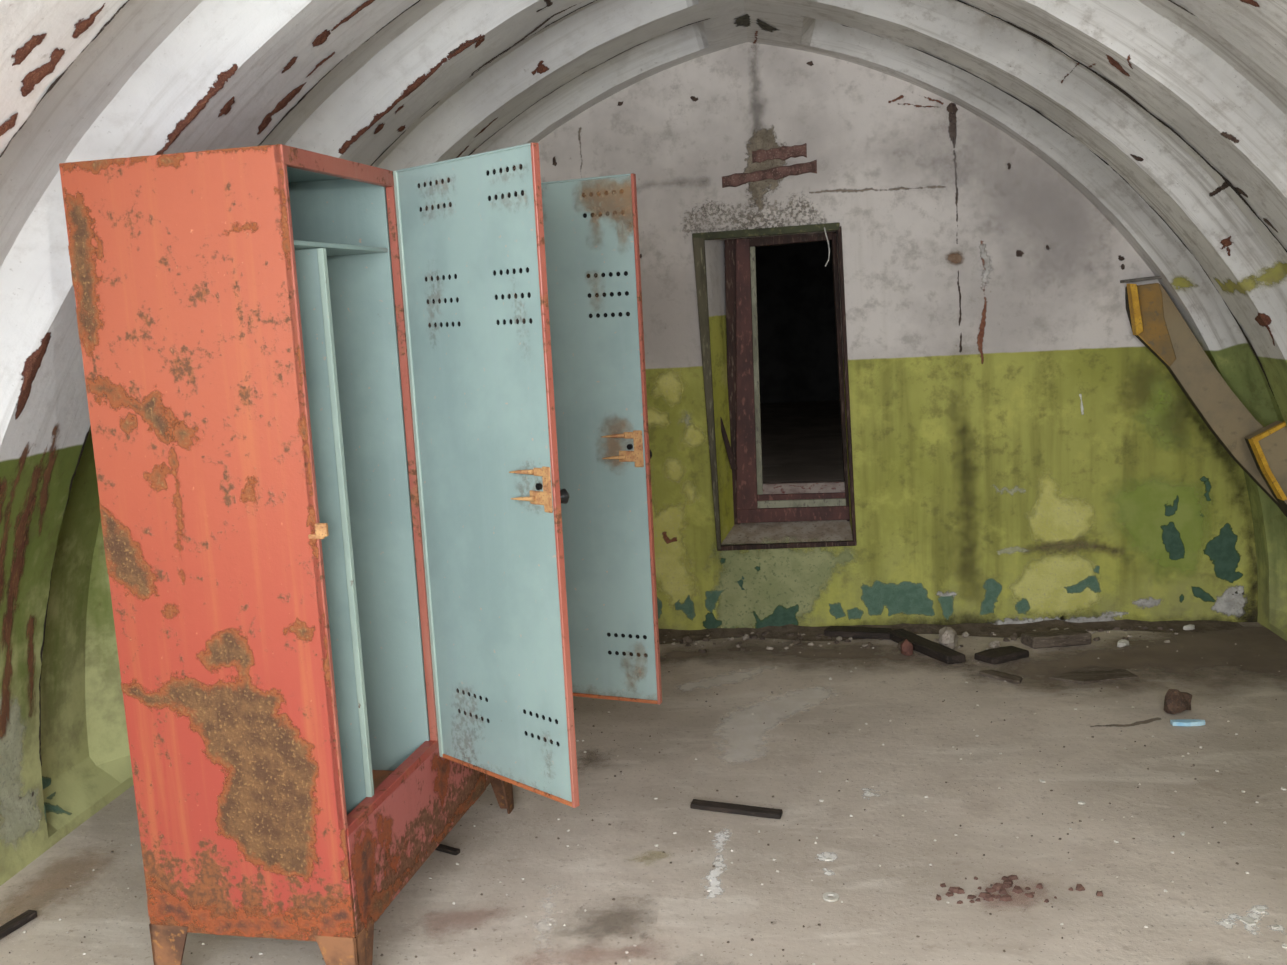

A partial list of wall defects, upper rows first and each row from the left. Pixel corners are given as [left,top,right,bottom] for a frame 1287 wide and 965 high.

spalling [532,60,549,75]
spalling [1061,55,1133,83]
spalling [683,126,826,233]
crack [809,95,962,352]
crack [842,0,1287,396]
spalling [1220,236,1233,256]
spalling [1209,182,1248,198]
rust [977,241,993,364]
rust [0,425,58,739]
peeling [829,580,956,620]
peeling [1161,495,1185,560]
peeling [1204,523,1243,583]